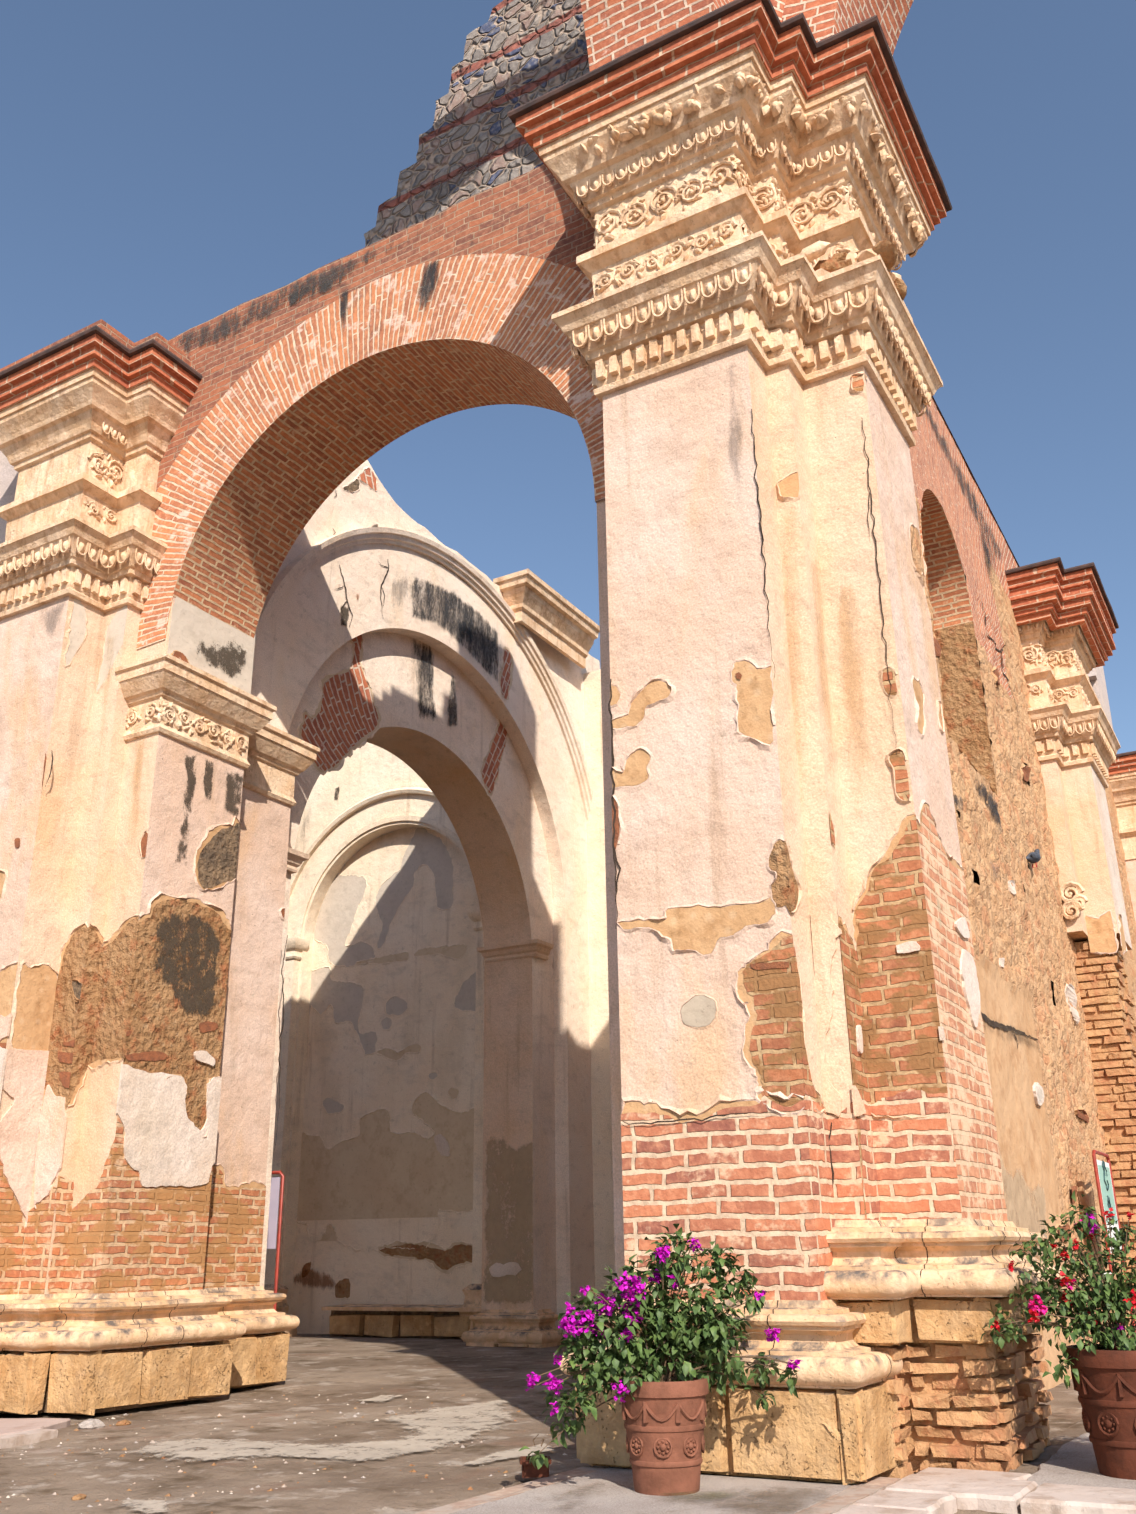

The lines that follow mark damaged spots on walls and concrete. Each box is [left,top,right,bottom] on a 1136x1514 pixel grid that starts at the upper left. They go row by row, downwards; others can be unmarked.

damp [340,291,348,320]
damp [419,261,438,305]
damp [197,641,246,677]
flaking render [297,634,382,776]
damp [413,578,498,677]
flaking render [729,656,777,751]
crack [751,409,775,677]
crack [862,420,897,755]
flaking render [0,816,266,1295]
damp [155,913,220,1016]
flaking render [309,828,467,1062]
flaking render [612,746,1038,1300]